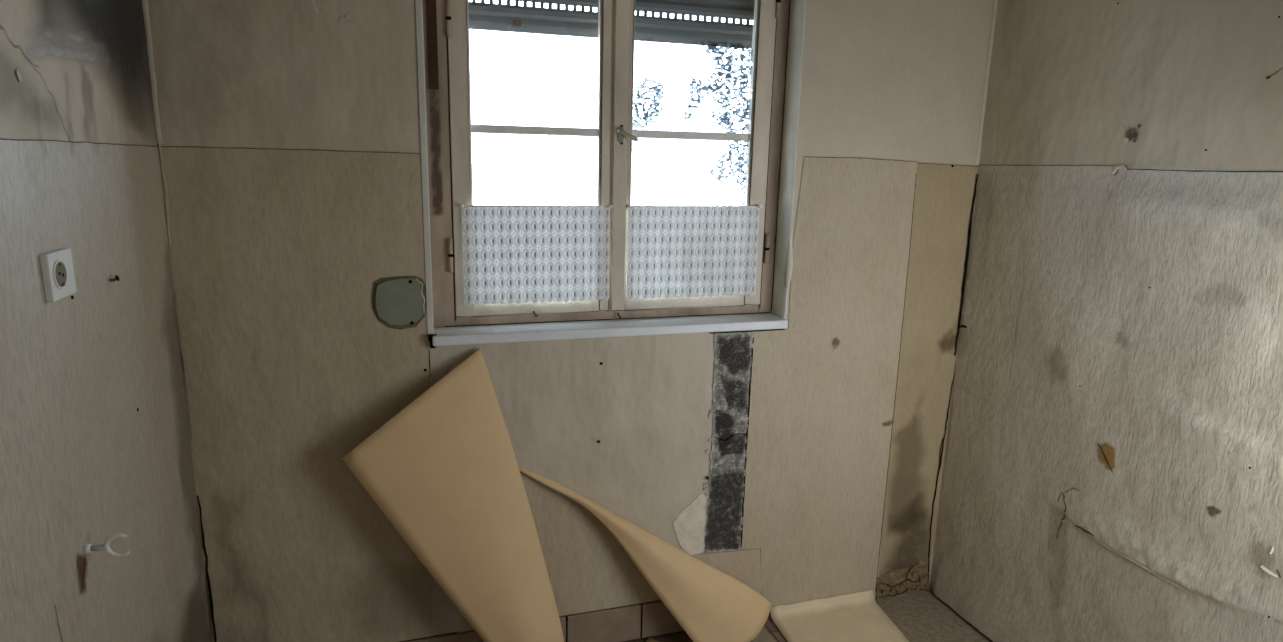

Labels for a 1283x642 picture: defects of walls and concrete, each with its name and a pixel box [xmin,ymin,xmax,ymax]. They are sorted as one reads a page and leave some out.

flaking render [673,332,754,555]